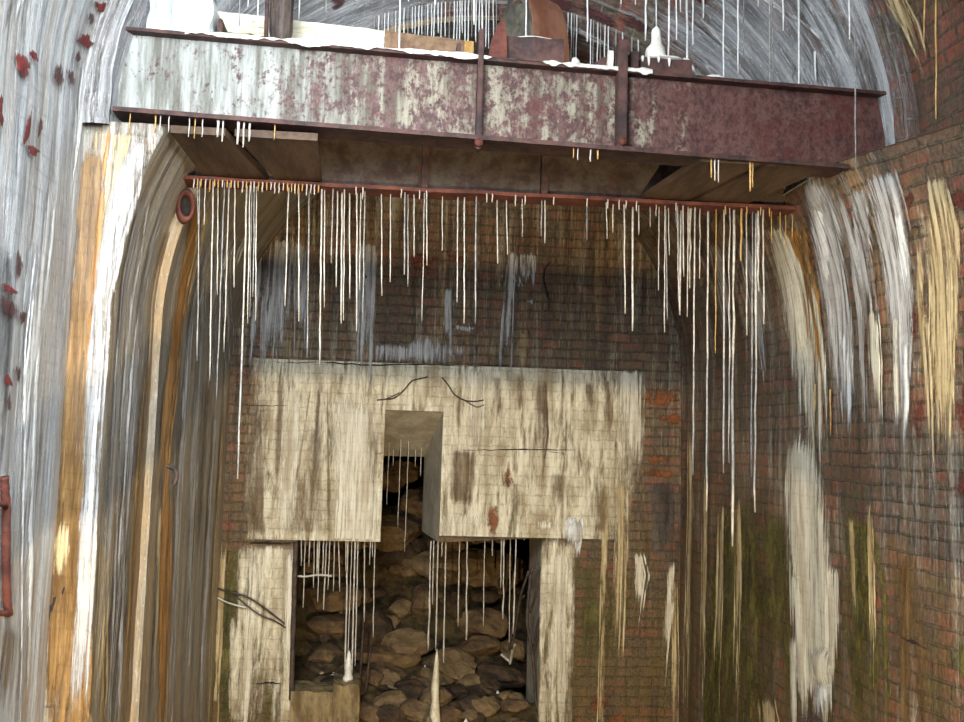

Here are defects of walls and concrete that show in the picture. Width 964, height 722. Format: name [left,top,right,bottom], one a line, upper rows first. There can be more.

spalling [14,49,39,78]
spalling [53,1,106,87]
spalling [21,112,44,156]
spalling [1,250,26,324]
spalling [4,365,21,410]
damp [71,142,163,722]
damp [160,219,779,722]
damp [769,170,960,722]